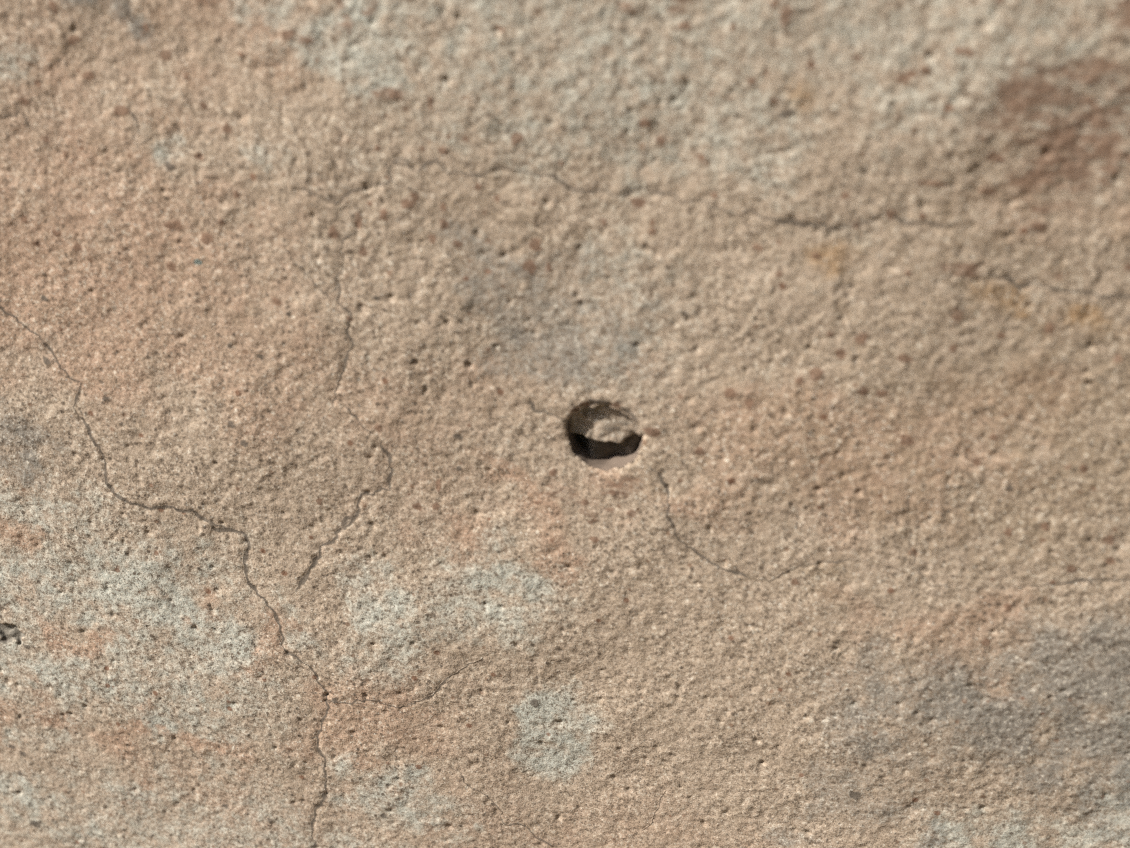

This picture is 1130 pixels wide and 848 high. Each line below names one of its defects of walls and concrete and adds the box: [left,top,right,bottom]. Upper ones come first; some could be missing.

crack [123,0,166,55]
crack [0,110,45,139]
crack [85,101,173,159]
crack [976,275,1130,300]
crack [280,128,967,592]
spalling [568,397,639,424]
crack [0,306,483,848]
spalling [0,616,32,651]
crack [447,765,559,848]
crack [641,790,666,830]